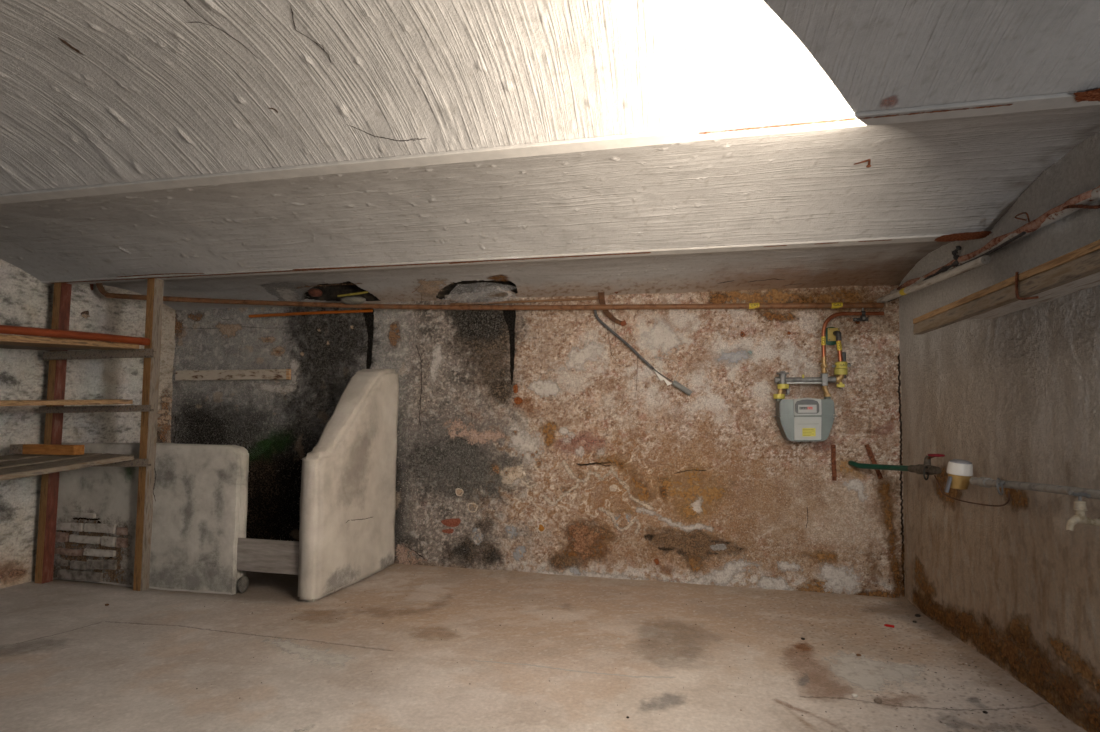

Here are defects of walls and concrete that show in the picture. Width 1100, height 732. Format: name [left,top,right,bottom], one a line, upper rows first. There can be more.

corrosion [1074,88,1100,102]
corrosion [896,185,1100,290]
leakage [708,289,873,323]
efflorescence [429,345,442,381]
leakage [503,310,516,385]
leakage [530,380,558,397]
leakage [407,422,558,502]
leakage [544,451,726,537]
mould [442,517,502,566]
leakage [538,507,641,580]
leakage [685,552,750,585]
leakage [759,479,903,598]